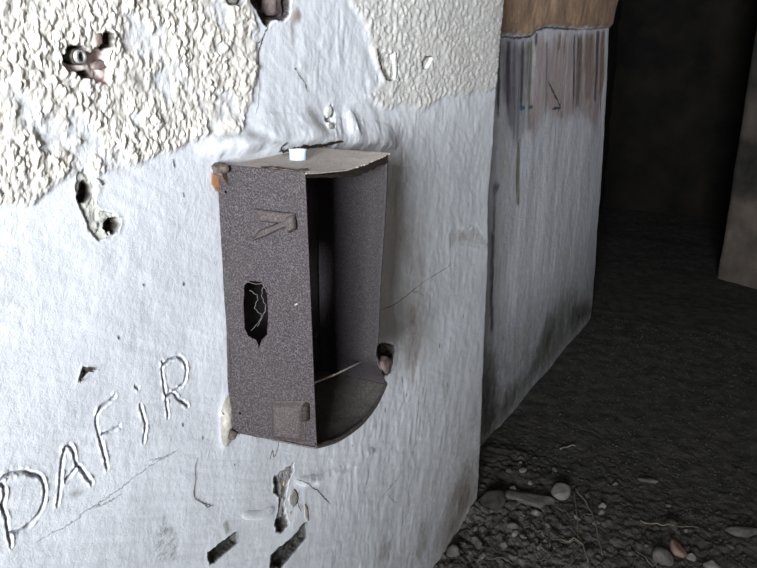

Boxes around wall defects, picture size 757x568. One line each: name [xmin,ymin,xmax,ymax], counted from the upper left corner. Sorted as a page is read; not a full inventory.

flaking render [226,0,290,26]
flaking render [62,32,115,84]
peeling [377,48,399,81]
leakage [497,32,604,204]
flaking render [75,170,120,240]
flaking render [377,343,395,376]
crack [39,450,177,541]
flaking render [270,462,309,568]
spalling [207,532,237,564]